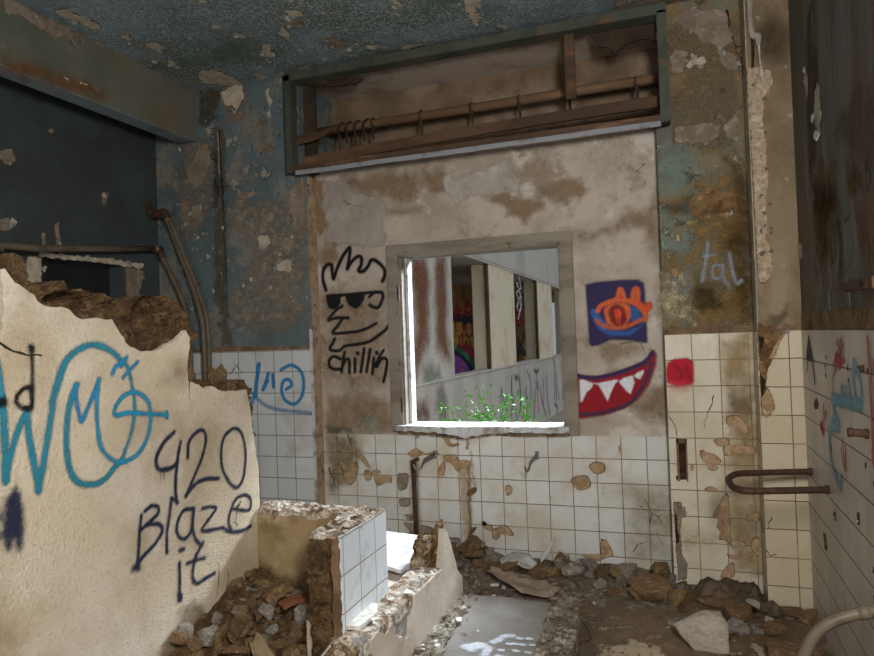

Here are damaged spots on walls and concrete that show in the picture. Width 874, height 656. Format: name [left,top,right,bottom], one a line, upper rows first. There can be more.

peeling [613,0,773,145]
water stain [350,173,443,199]
water stain [491,181,584,221]
peeling [26,222,145,296]
peeling [659,153,790,417]
crack [0,342,42,356]
spalling [339,449,434,535]
spalling [408,435,471,479]
spalling [571,462,605,490]
spalling [469,525,514,540]
spalling [673,502,688,581]
spalling [705,486,761,578]